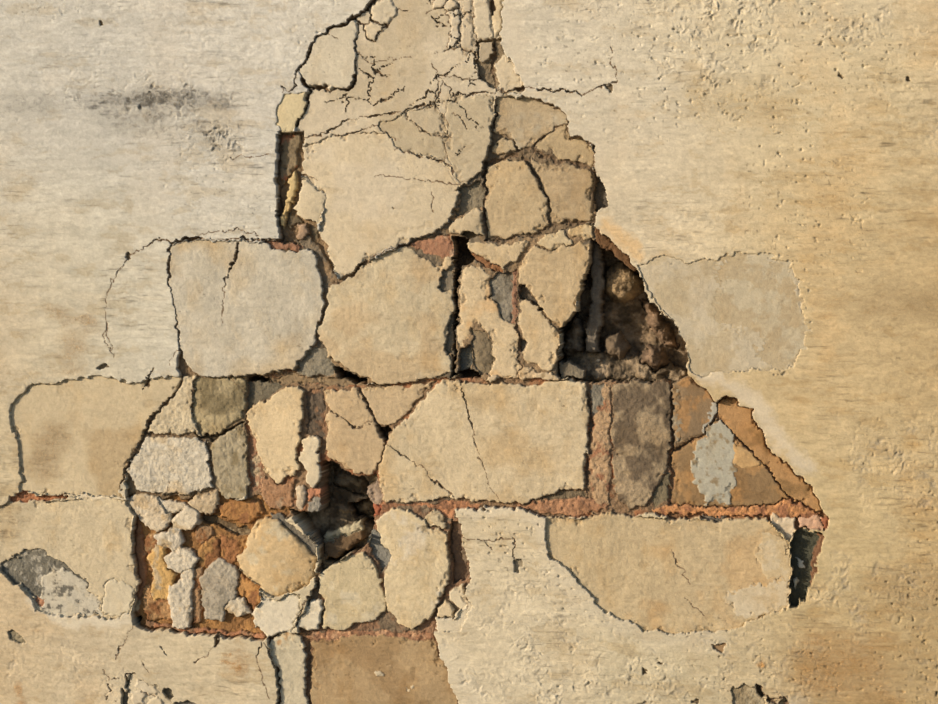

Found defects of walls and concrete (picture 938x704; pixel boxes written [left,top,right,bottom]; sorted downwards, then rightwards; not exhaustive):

crack [280,0,618,343]
crack [102,174,318,502]
spalling [0,0,608,704]
crack [514,272,524,378]
spalling [603,249,623,268]
flaking render [600,252,811,377]
crack [584,385,595,496]
spalling [246,370,829,704]
crack [295,562,325,704]